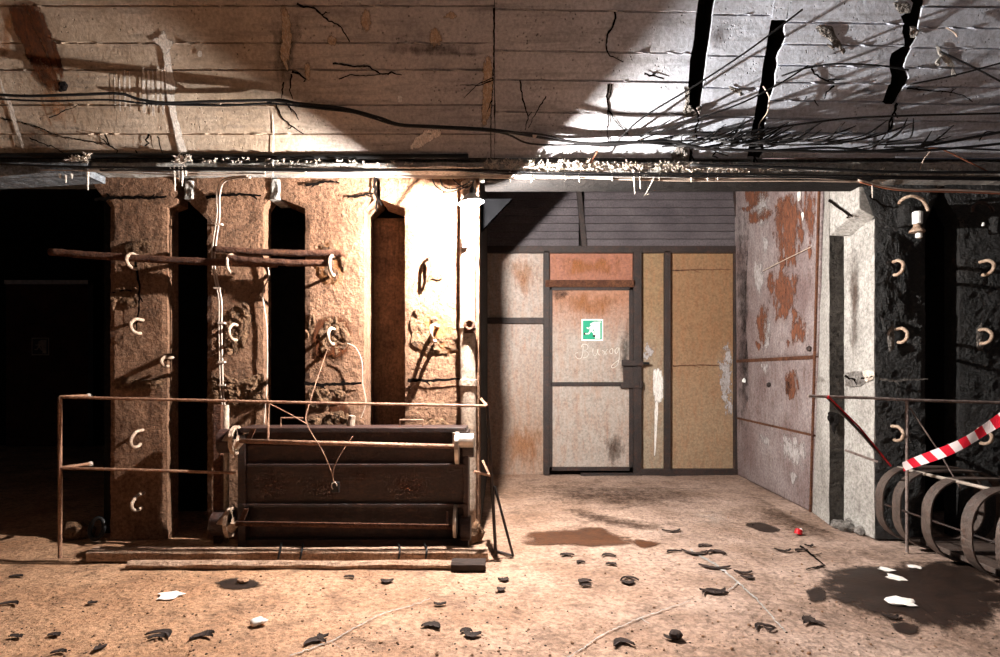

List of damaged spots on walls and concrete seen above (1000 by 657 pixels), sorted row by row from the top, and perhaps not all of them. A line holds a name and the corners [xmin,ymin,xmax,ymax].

spalling [894,2,911,14]
crack [297,3,402,79]
crack [606,12,623,62]
crack [519,80,546,130]
spalling [683,86,702,118]
spalling [223,302,251,356]
spalling [305,314,354,356]
spalling [206,374,265,409]
spalling [307,387,349,425]
leakage [526,509,659,548]
leakage [806,561,1000,634]